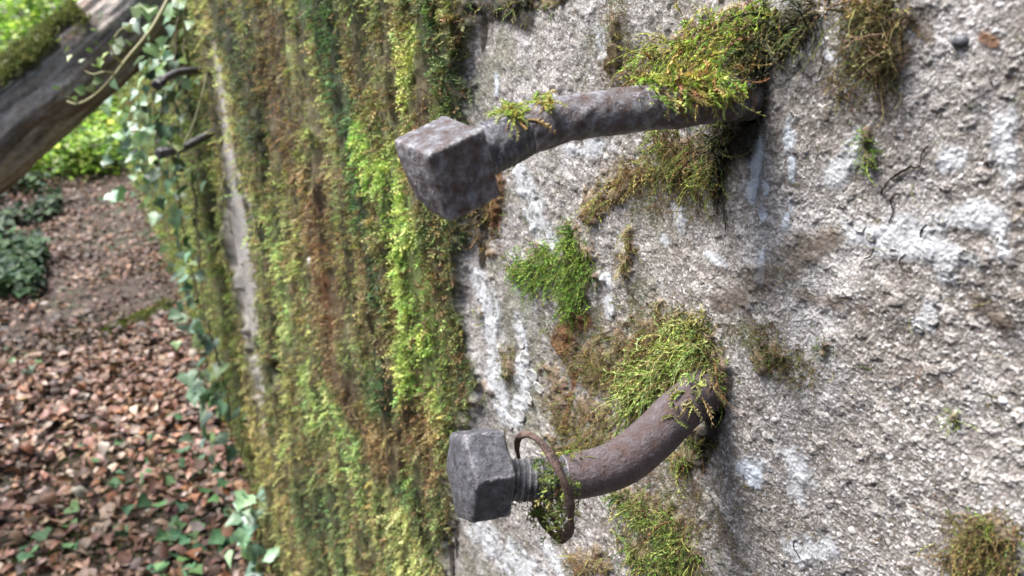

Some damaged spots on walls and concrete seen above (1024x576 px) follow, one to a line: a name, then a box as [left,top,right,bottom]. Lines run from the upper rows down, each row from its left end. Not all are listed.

corrosion [487,173,505,231]
water stain [470,205,530,426]